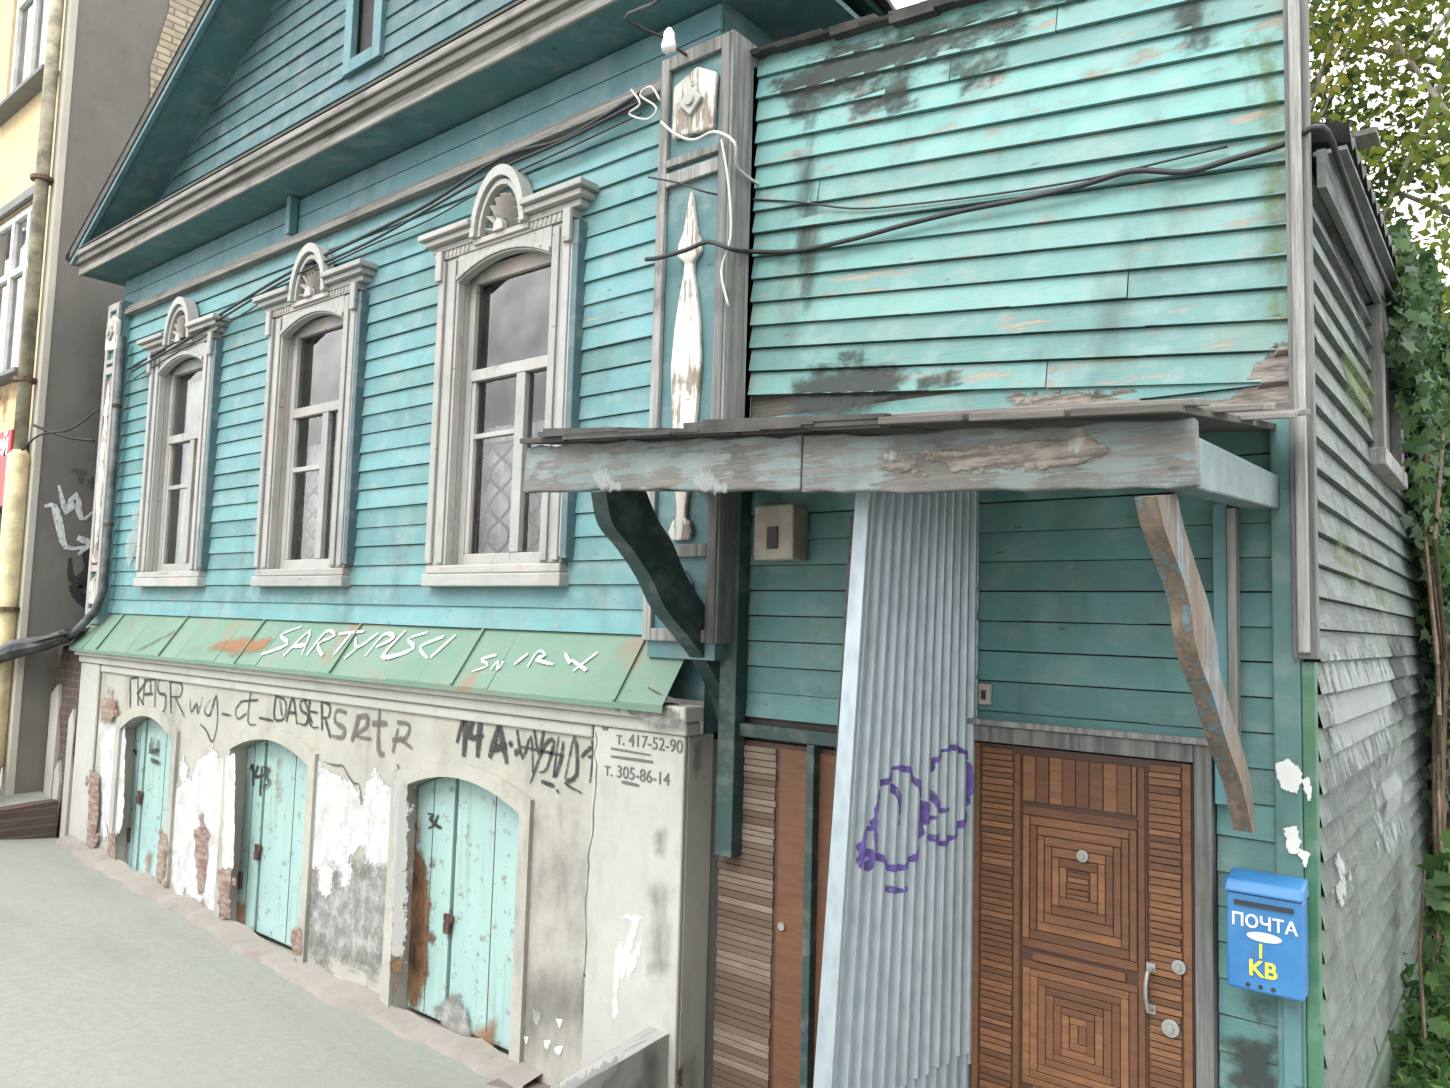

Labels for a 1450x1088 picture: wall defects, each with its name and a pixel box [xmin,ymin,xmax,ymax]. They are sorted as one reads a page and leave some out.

leakage [772,0,1080,123]
leakage [1175,0,1209,48]
leakage [789,352,956,416]
peeling [880,432,1109,477]
peeling [85,688,126,860]
peeling [156,744,236,919]
flaking render [291,760,415,982]
rust [407,822,436,1012]
peeling [1276,759,1312,801]
peeling [1283,826,1311,867]